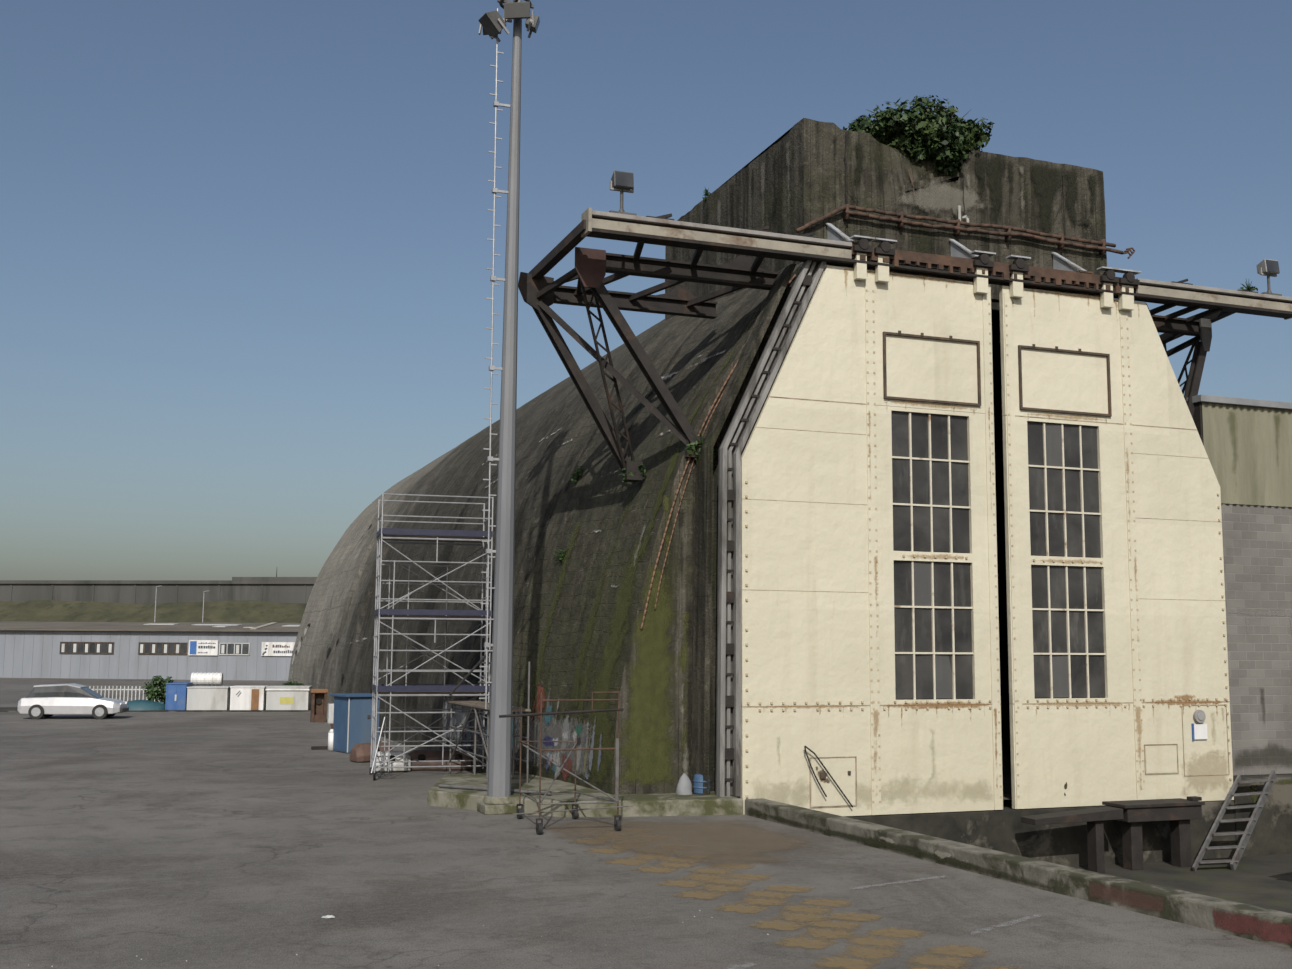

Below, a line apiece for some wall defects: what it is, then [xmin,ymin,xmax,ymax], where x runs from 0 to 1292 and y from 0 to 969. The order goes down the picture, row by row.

corrosion [850,244,1137,293]
corrosion [887,702,997,726]
corrosion [1152,695,1220,714]